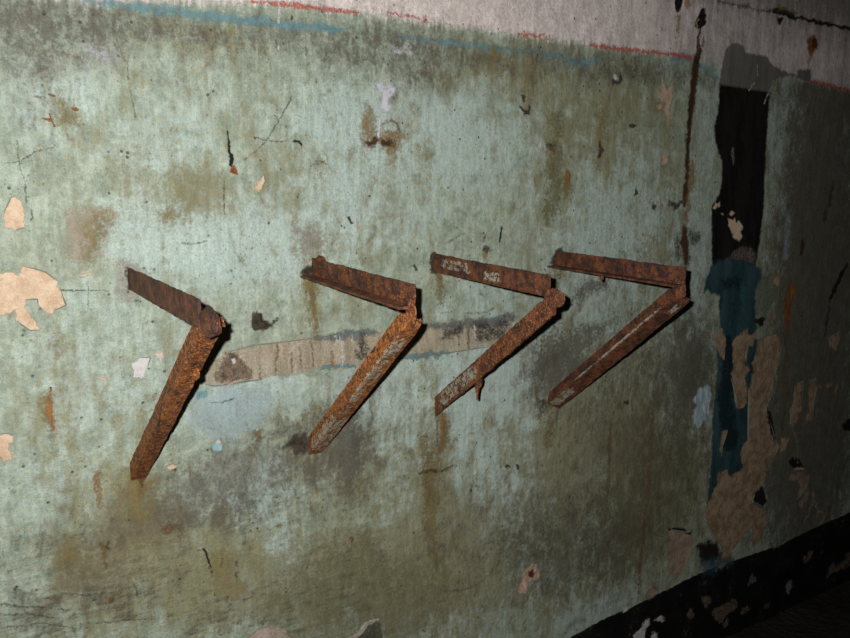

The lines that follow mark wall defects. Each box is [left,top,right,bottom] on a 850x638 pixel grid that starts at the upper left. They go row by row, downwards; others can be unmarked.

crack [718,1,850,31]
rust [674,29,704,265]
peeling [3,196,25,231]
peeling [713,202,743,241]
peeling [0,266,67,331]
spalling [251,312,277,331]
rust [304,279,321,329]
spalling [208,336,324,387]
peeling [704,275,838,572]
peeling [633,615,664,638]
peeling [701,596,750,628]